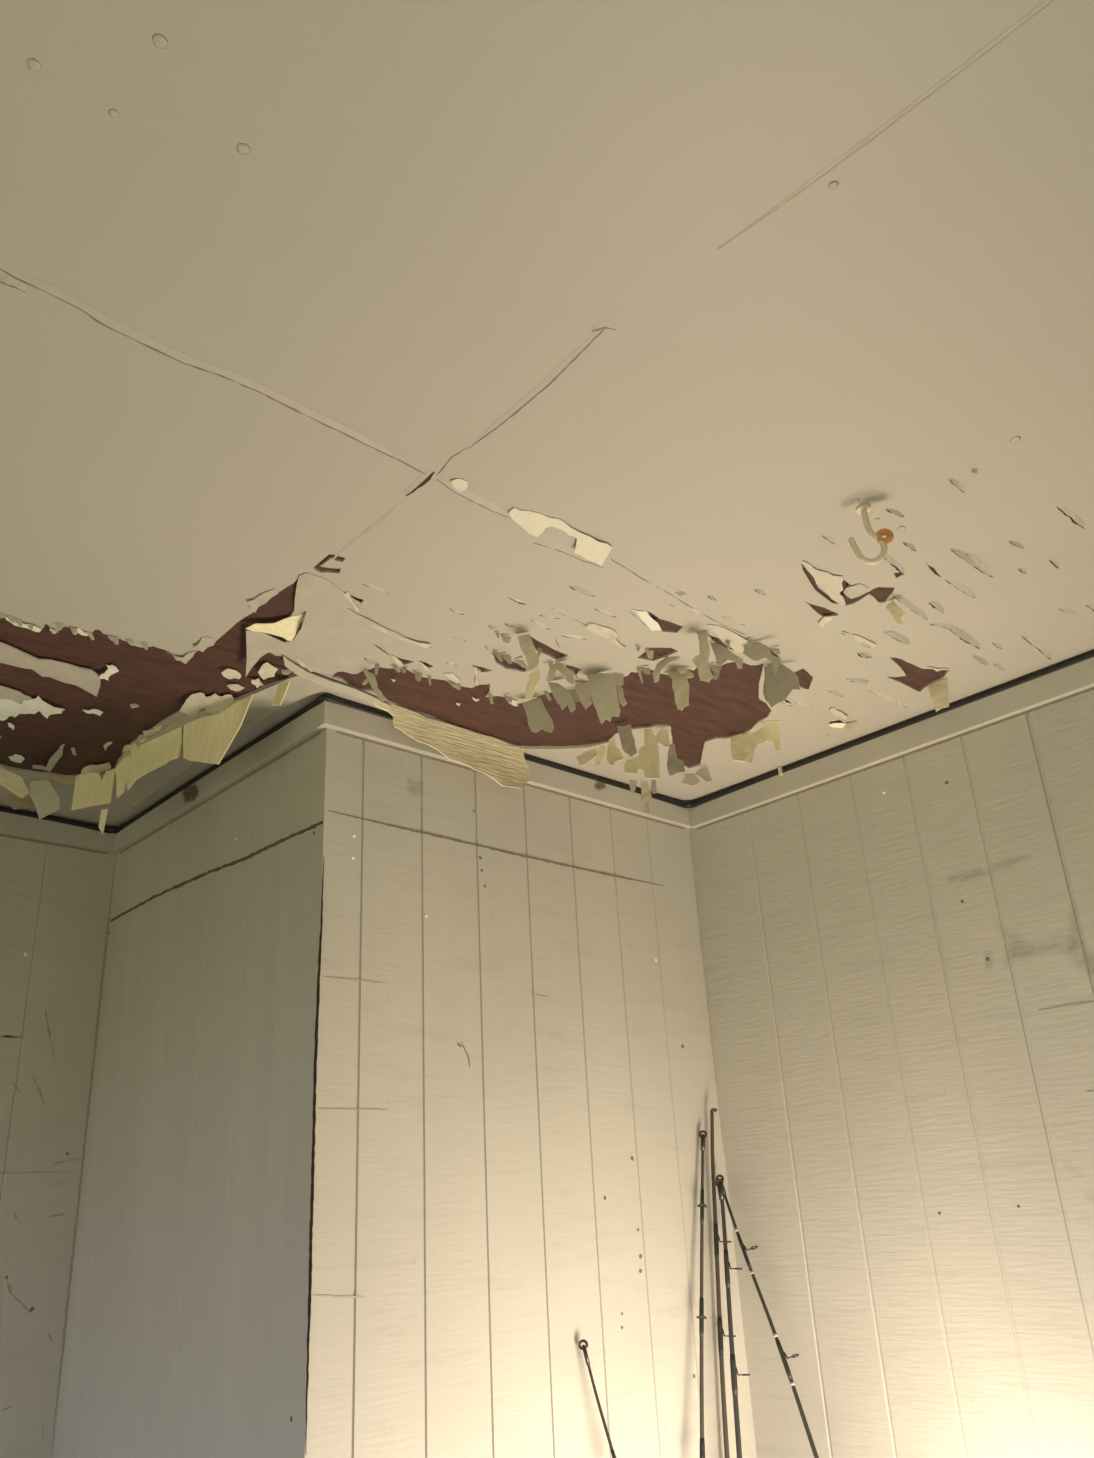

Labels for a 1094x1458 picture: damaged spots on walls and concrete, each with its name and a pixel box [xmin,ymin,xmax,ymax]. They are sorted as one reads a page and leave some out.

peeling [451,478,468,492]
peeling [509,507,612,566]
peeling [1057,506,1086,529]
peeling [0,542,1004,835]